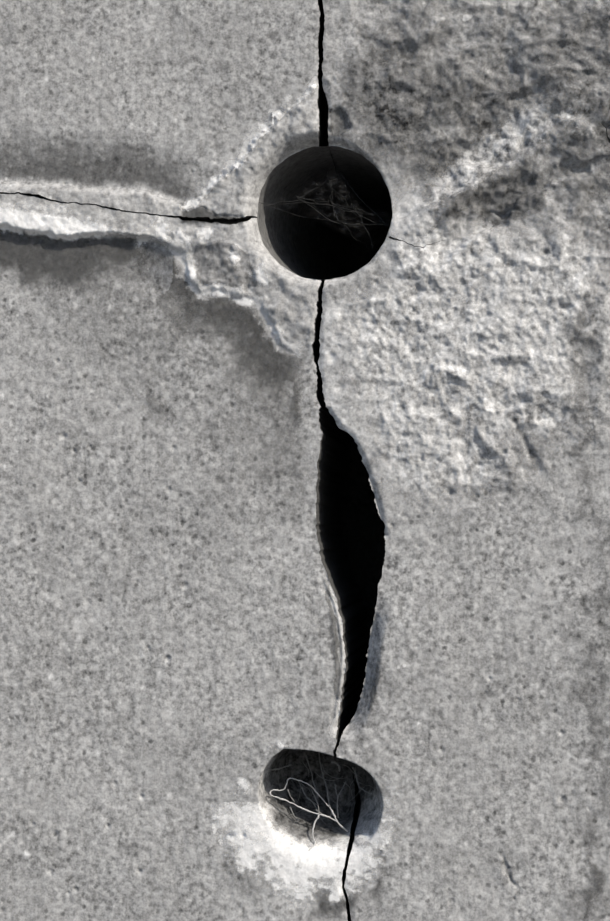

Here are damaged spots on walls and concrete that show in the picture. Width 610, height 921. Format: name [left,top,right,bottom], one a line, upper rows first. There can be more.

crack [317,0,336,177]
crack [602,100,610,143]
crack [0,192,257,224]
water stain [0,202,302,383]
spalling [318,0,610,503]
crack [312,282,386,755]
water stain [212,777,395,913]
spalling [264,749,376,837]
crack [342,771,361,921]